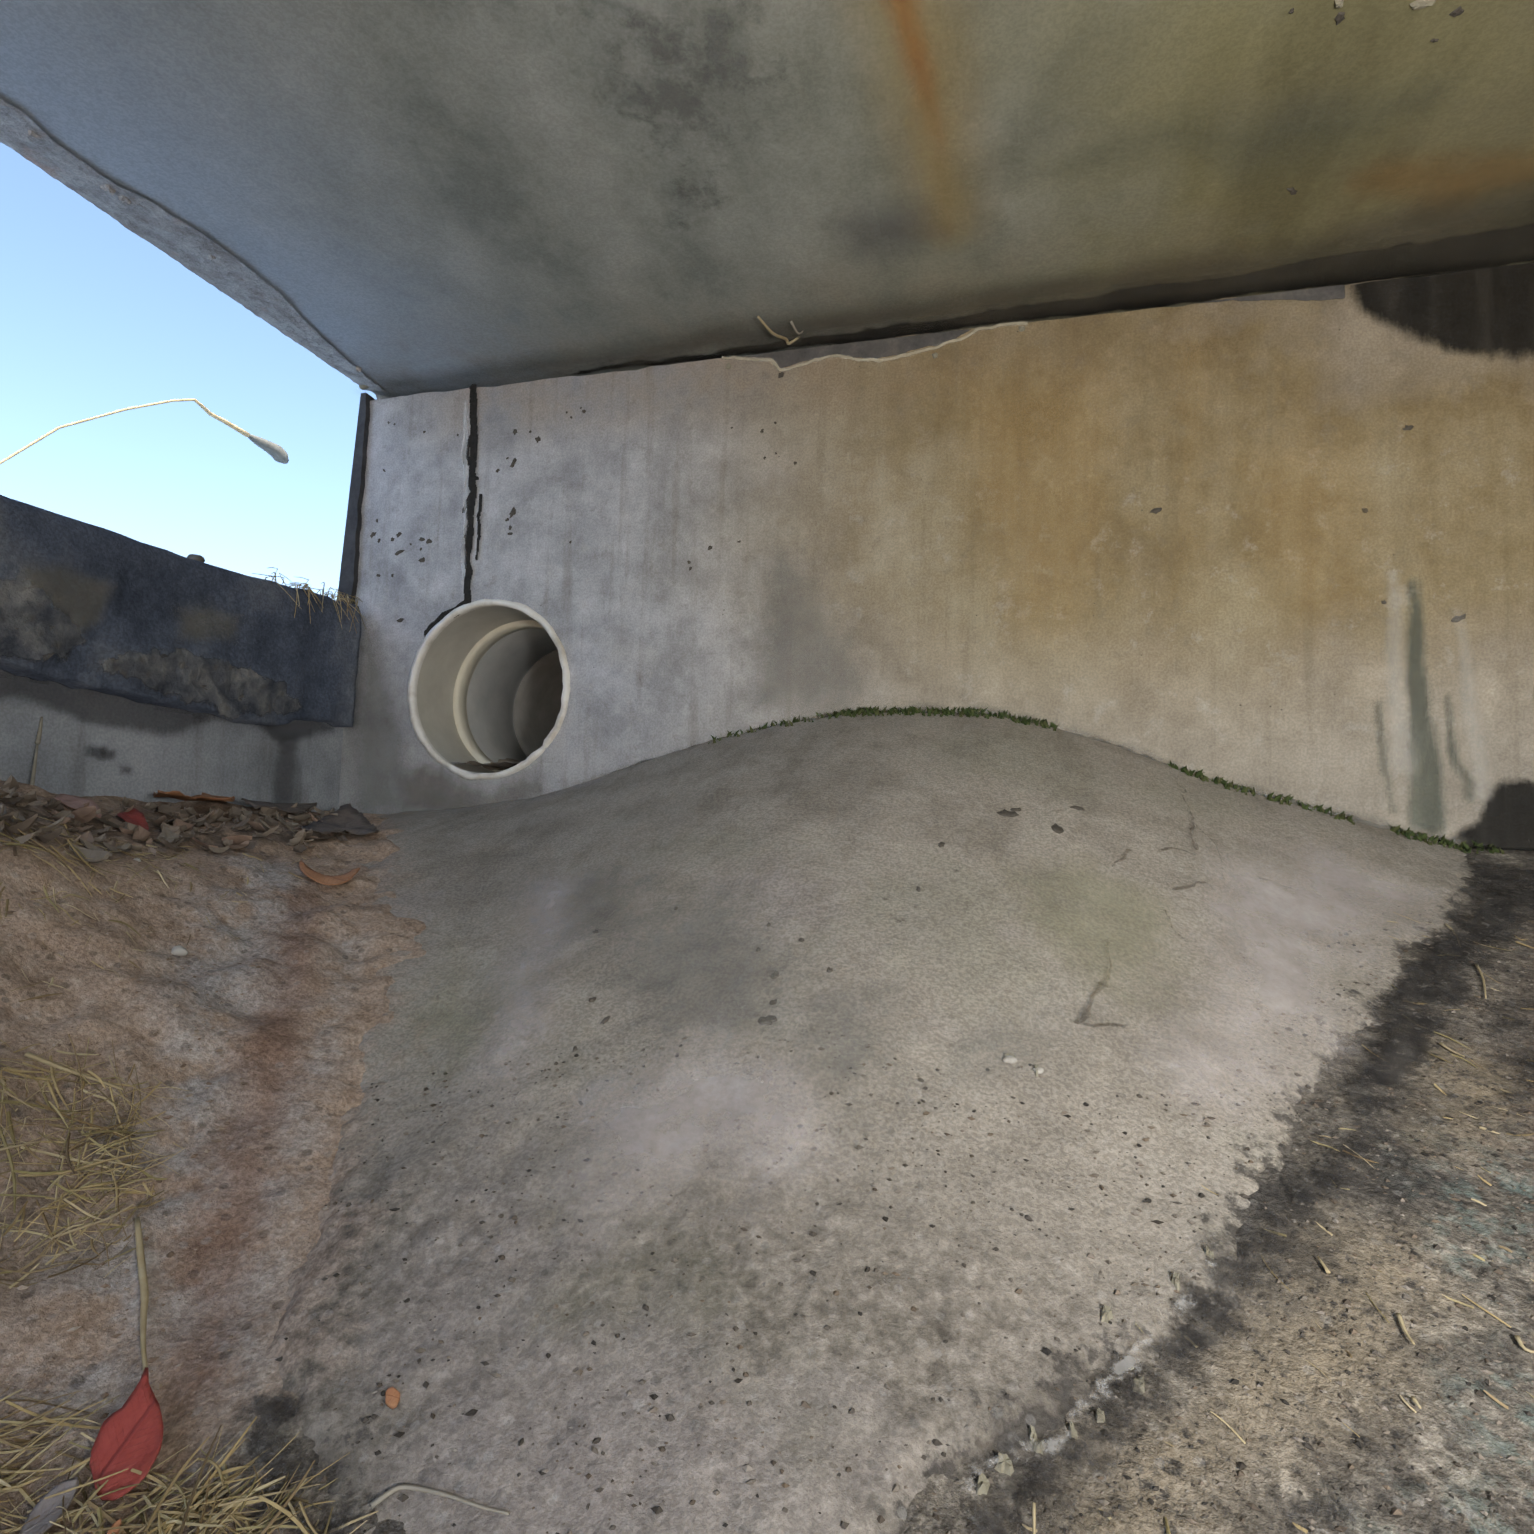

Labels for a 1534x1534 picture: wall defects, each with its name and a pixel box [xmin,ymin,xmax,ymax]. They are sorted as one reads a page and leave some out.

damp [574,224,1534,375]
crack [424,384,482,636]
damp [1153,586,1534,1360]
damp [237,1394,346,1534]
damp [975,1373,1186,1534]